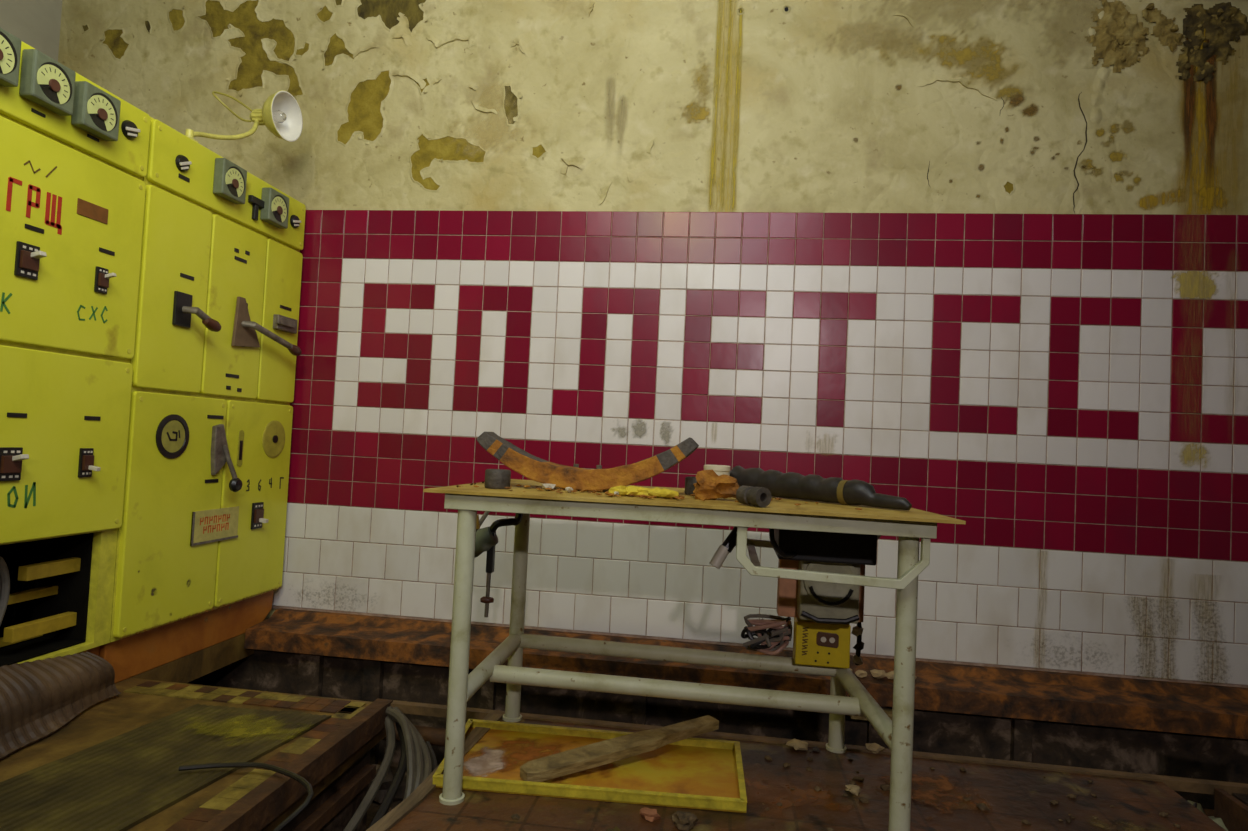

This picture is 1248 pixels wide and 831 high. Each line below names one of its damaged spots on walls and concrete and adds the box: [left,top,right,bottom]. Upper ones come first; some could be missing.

peeling [82,24,131,61]
peeling [167,0,476,100]
peeling [335,69,442,147]
peeling [409,132,488,193]
peeling [469,82,523,127]
crack [1073,92,1087,213]
rust [1179,29,1222,214]